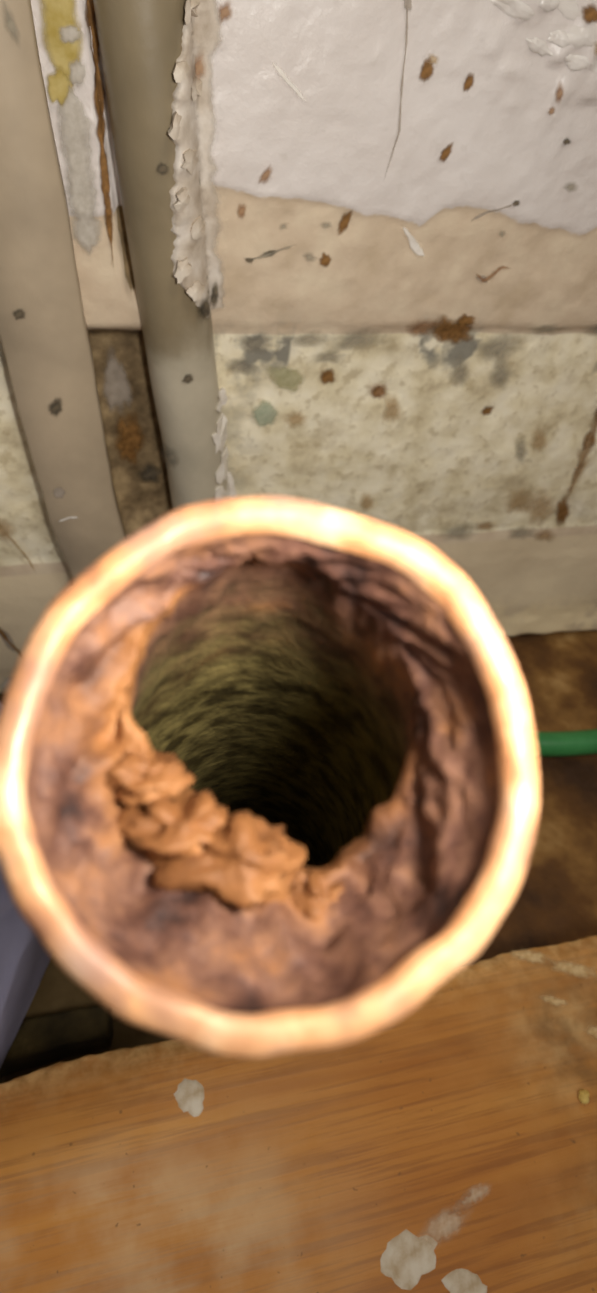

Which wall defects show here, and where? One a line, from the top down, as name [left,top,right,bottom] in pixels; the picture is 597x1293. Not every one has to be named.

flaking render [168,0,224,318]
damp [255,402,302,425]
damp [271,368,302,390]
rust [511,411,597,539]